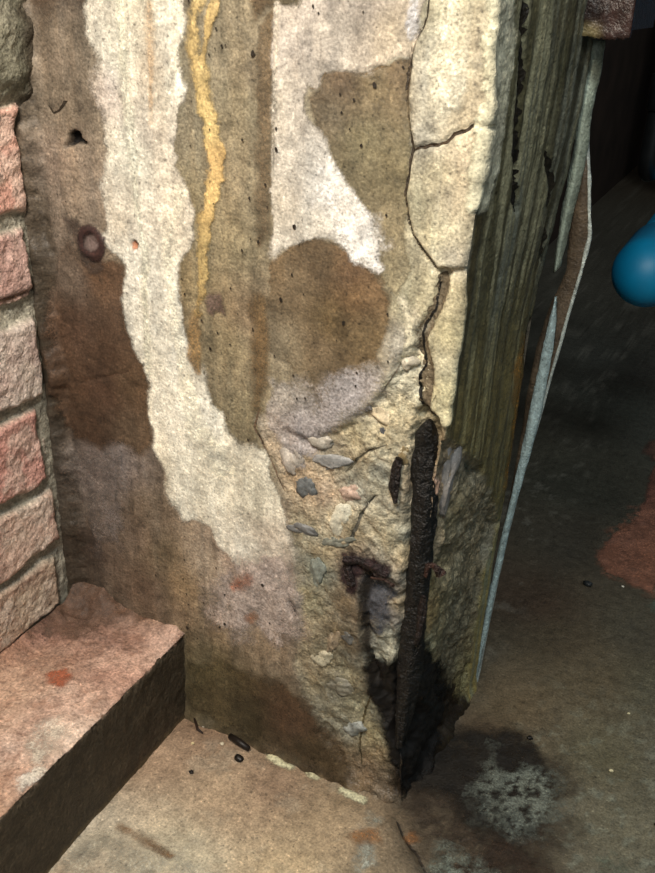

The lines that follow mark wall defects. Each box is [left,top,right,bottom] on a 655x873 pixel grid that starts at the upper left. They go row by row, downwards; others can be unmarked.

rust [66,218,105,274]
damp [37,0,301,646]
damp [251,58,424,467]
crack [360,0,475,415]
rust [388,456,403,504]
spalling [253,296,557,805]
damp [187,659,367,804]
rust [362,595,470,797]
damp [398,729,564,873]